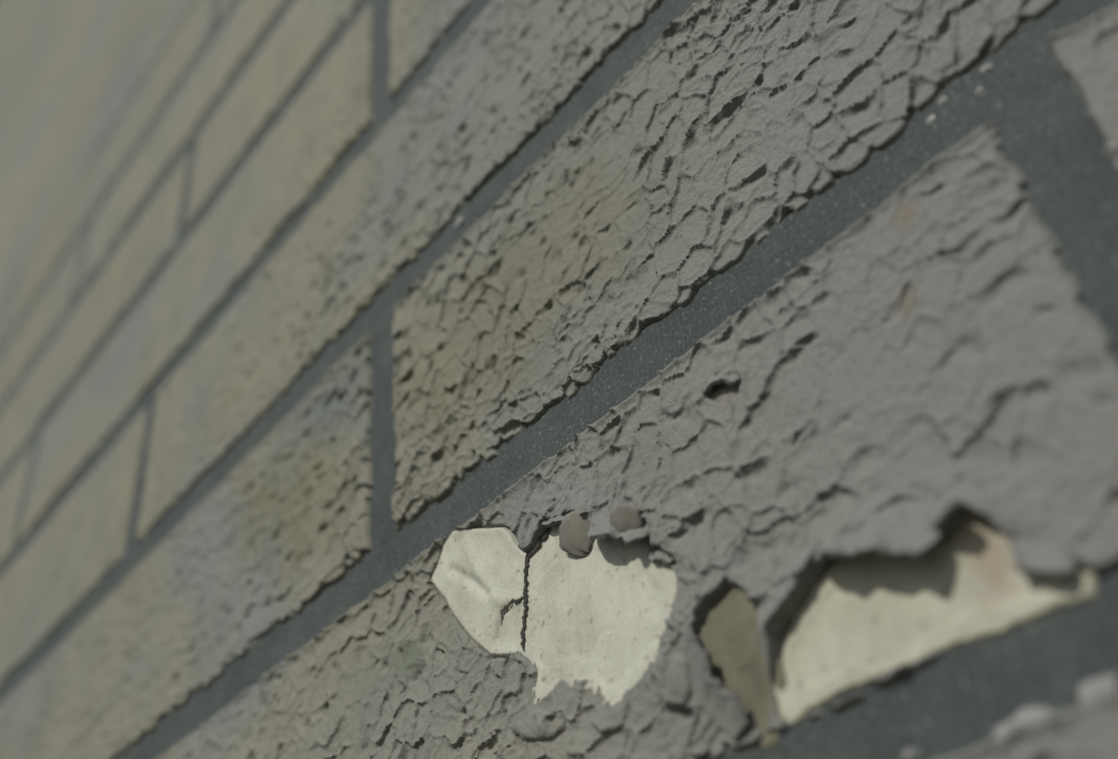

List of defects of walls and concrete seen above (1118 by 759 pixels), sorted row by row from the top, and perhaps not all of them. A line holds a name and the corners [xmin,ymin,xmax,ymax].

crack [501,523,561,651]
peeling [431,504,678,706]
peeling [677,497,1097,749]